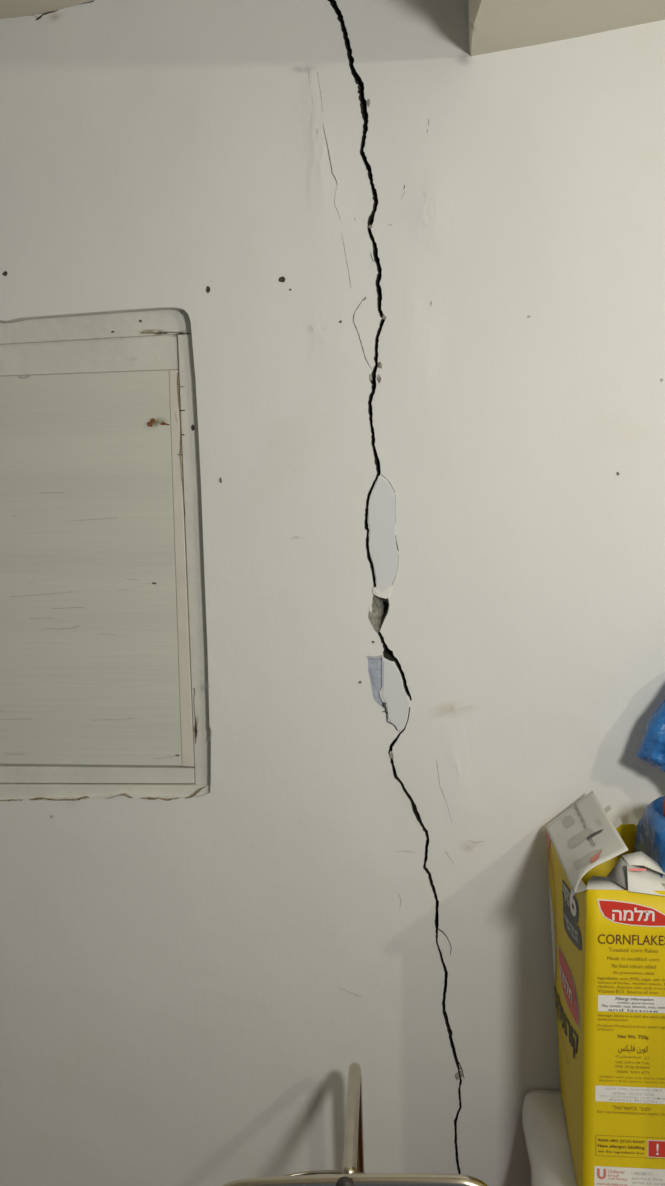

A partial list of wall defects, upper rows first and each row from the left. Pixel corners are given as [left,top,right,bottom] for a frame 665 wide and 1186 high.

crack [30,1,94,20]
crack [309,0,431,588]
crack [175,372,186,516]
flaking render [368,476,399,633]
flaking render [366,655,409,732]
crack [377,630,484,1174]